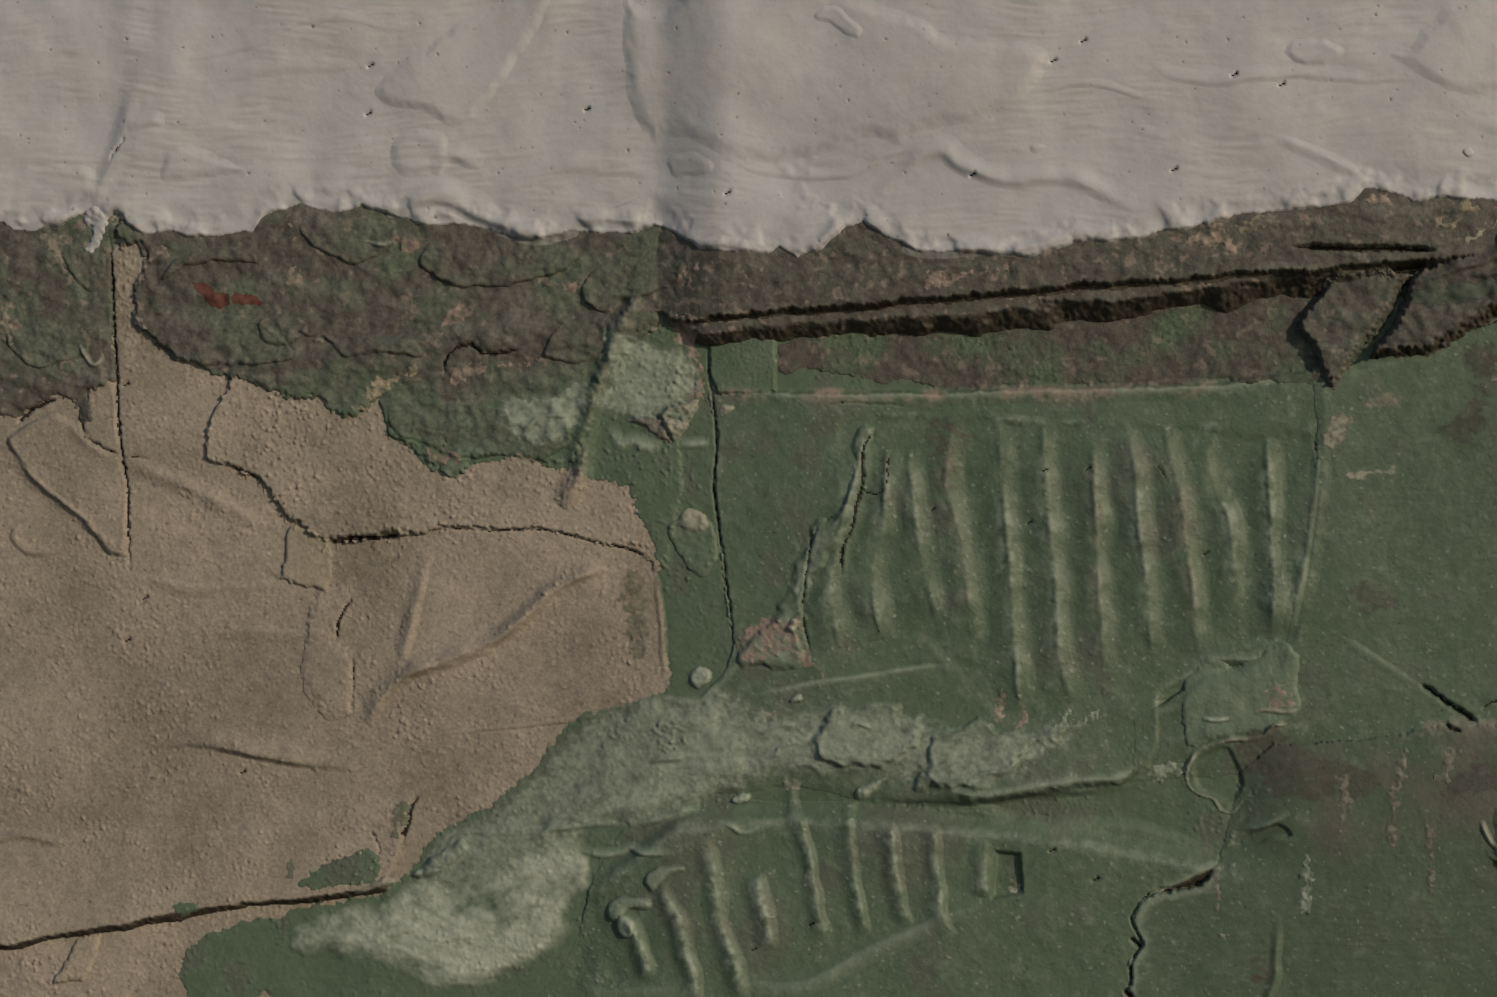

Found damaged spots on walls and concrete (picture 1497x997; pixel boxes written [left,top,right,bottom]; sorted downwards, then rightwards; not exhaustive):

peeling [1188,214,1281,254]
peeling [38,213,170,372]
peeling [924,261,1015,290]
peeling [1297,199,1497,390]
crack [20,399,54,421]
crack [82,260,138,540]
peeling [606,313,709,454]
crack [332,534,398,542]
peeling [204,356,663,722]
crack [455,528,641,555]
crack [372,799,417,854]
peeling [51,933,101,986]